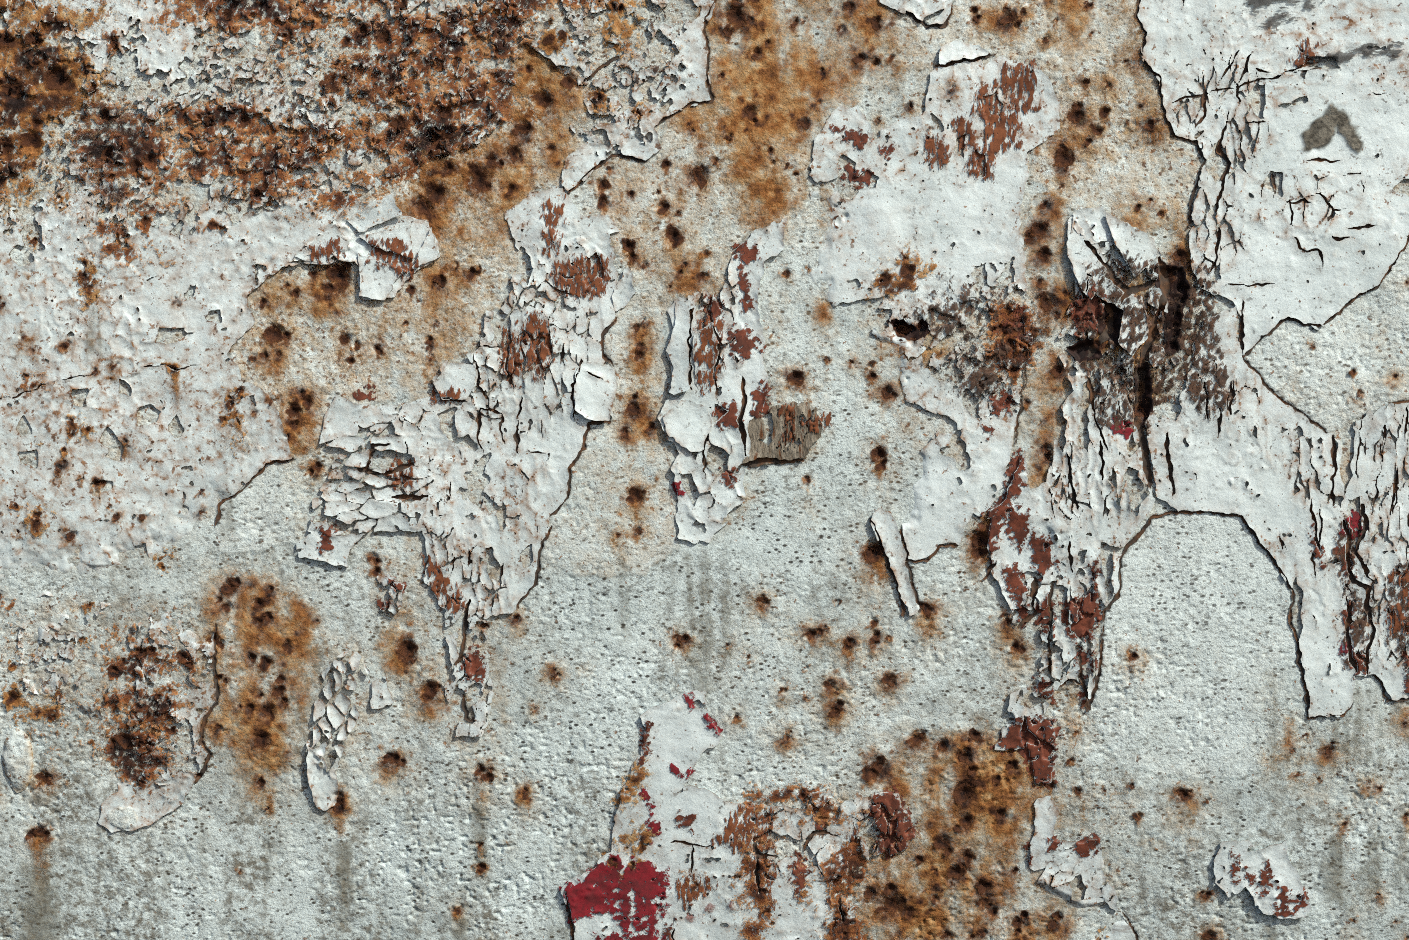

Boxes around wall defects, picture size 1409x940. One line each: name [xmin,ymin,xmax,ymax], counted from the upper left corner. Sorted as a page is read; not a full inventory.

peeling [0,0,213,94]
corrosion [0,0,684,382]
corrosion [588,0,904,299]
crack [906,1,997,68]
crack [1014,364,1027,445]
crack [1018,0,1409,720]
peeling [871,508,919,616]
crack [869,520,958,618]
corrosion [0,573,321,813]
peeling [559,690,920,940]
corrosion [680,720,1110,940]
peeling [1213,840,1311,919]